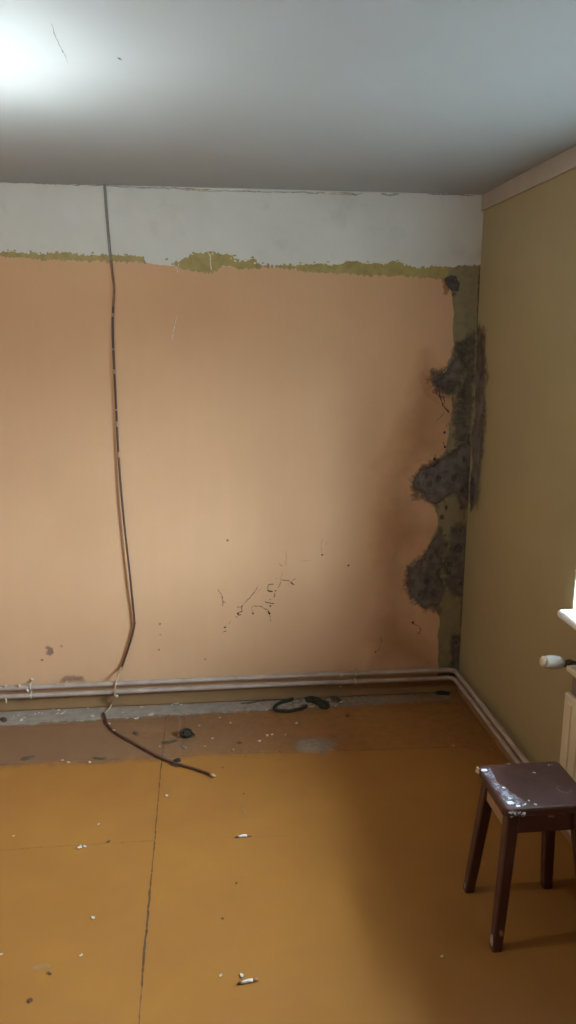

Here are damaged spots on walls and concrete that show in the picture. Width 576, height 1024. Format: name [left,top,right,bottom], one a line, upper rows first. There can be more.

peeling [0,250,146,264]
peeling [165,251,481,463]
damp [406,327,488,613]
peeling [422,493,469,677]